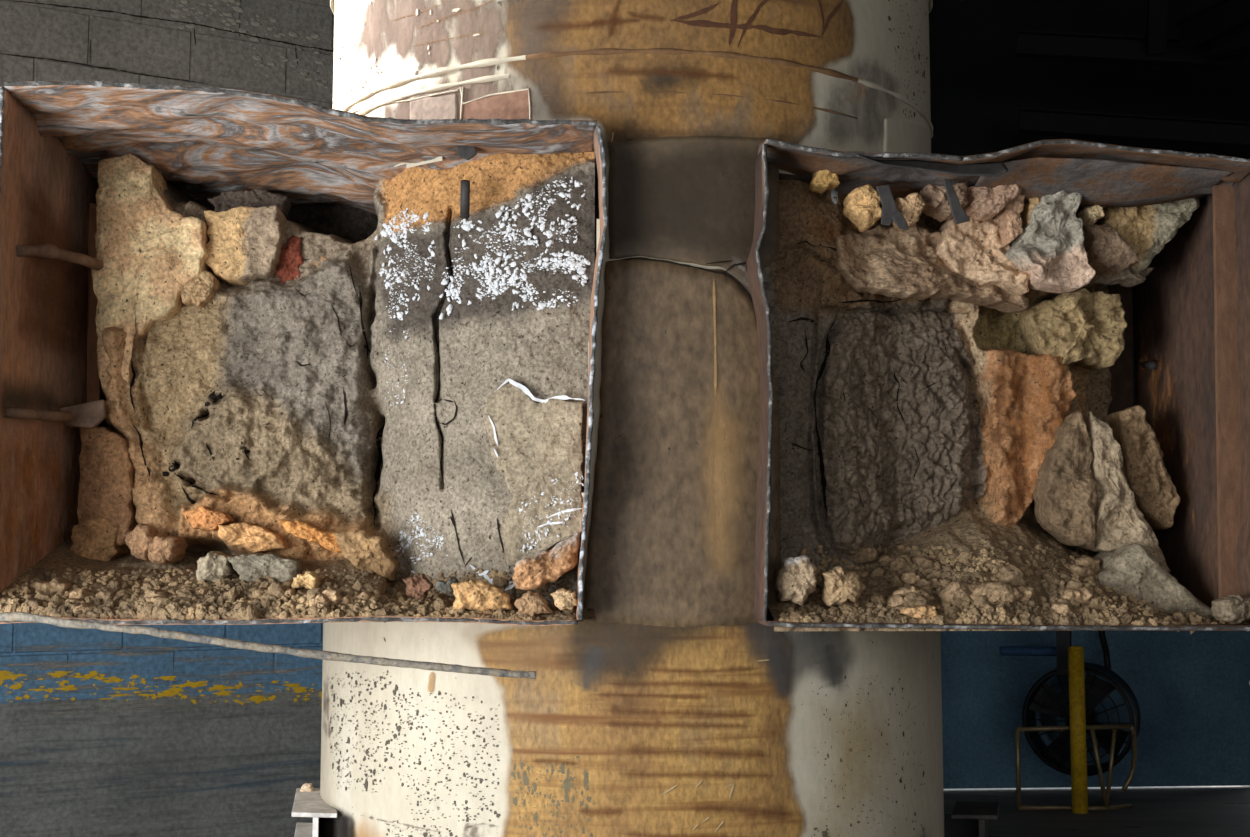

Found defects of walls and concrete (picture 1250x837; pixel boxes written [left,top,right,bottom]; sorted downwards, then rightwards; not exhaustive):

rust [506,0,854,145]
spalling [69,518,321,589]
crack [433,212,458,479]
spalling [333,381,583,617]
crack [450,510,472,566]
damp [374,177,591,415]
crack [497,519,510,569]
spalling [774,555,866,606]
crack [789,298,958,521]
spalling [809,170,1154,370]
spalling [1033,405,1181,572]
rust [478,622,804,837]